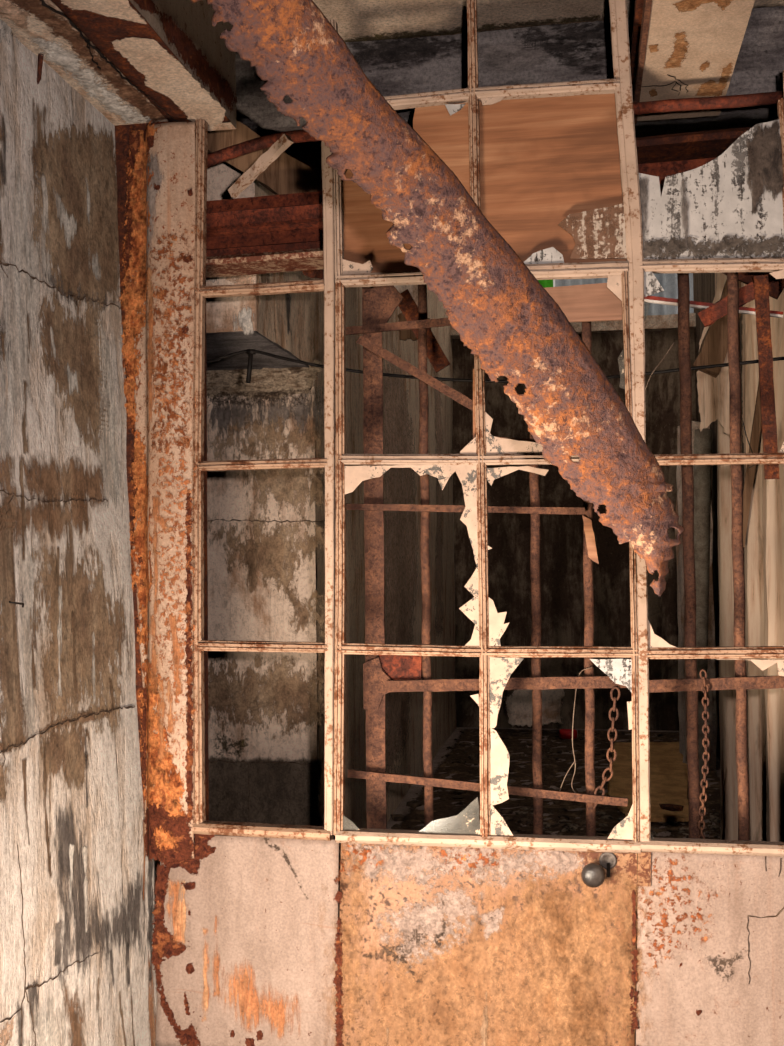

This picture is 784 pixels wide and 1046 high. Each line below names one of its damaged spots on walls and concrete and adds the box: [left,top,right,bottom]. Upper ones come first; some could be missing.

crack [0,260,121,310]
water stain [0,103,154,1046]
corrosion [10,0,297,1046]
crack [0,705,135,766]
corrosion [333,844,384,903]
corrosion [434,846,500,877]
crack [0,845,96,1046]
corrosion [333,917,344,1046]
corrosion [629,855,718,1046]